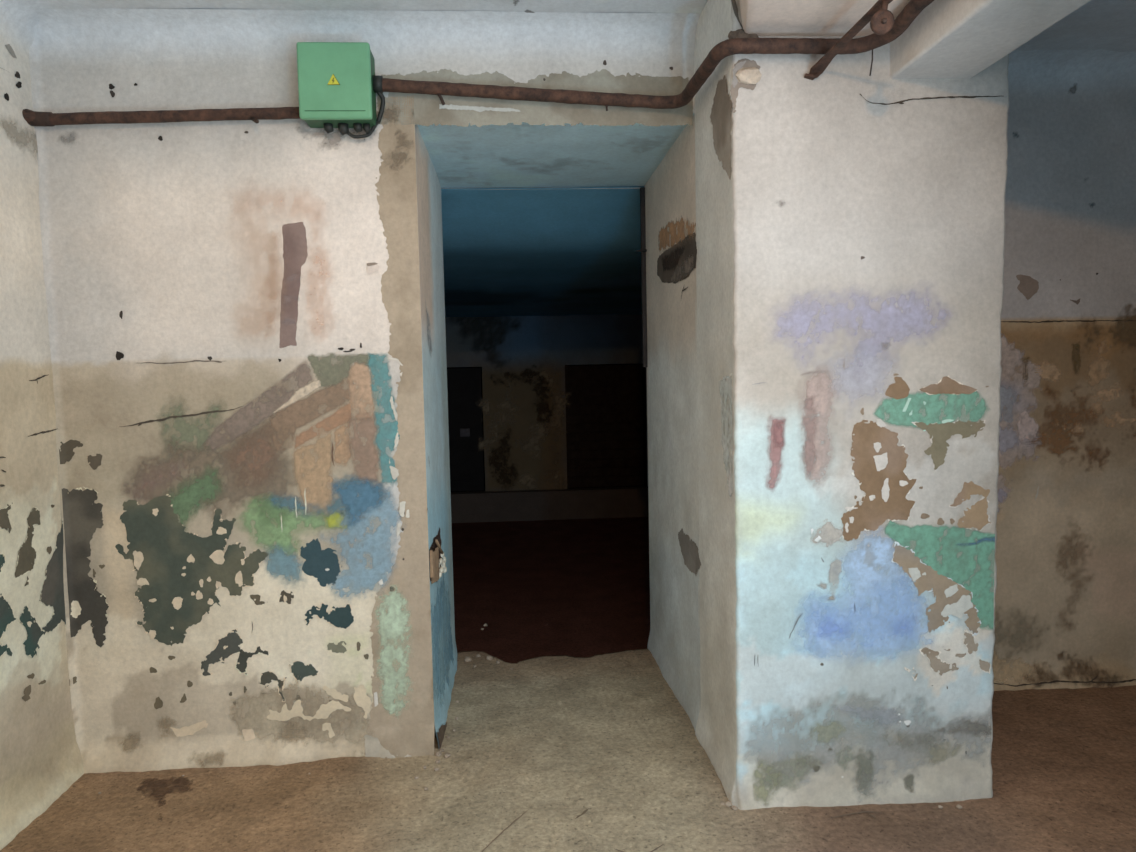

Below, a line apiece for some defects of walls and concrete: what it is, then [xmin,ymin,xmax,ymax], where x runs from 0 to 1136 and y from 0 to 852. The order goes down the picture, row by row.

spalling [710,58,762,180]
crack [860,94,998,105]
peeling [59,440,102,470]
crack [121,406,242,427]
peeling [180,60,697,758]
peeling [811,335,1061,546]
peeling [0,487,109,658]
peeling [115,494,269,660]
spalling [678,528,701,575]
peeling [891,541,991,689]
leakage [992,621,1118,688]
crack [994,675,1136,687]